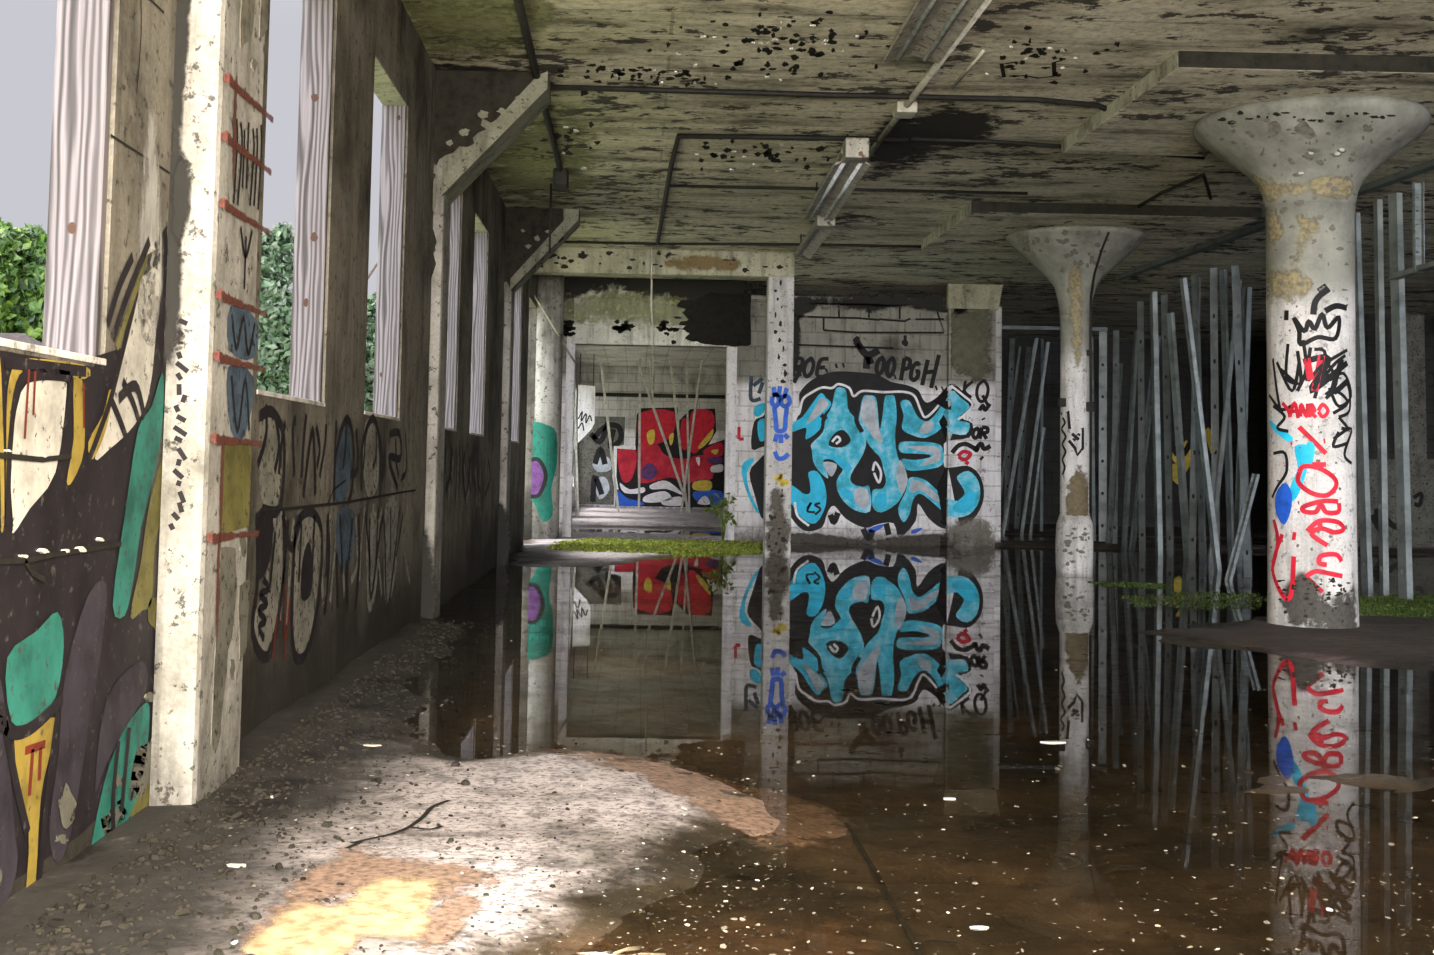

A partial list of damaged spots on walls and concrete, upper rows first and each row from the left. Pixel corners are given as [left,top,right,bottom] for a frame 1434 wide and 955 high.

peeling [580,10,869,96]
rust [219,72,273,236]
peeling [433,68,565,181]
leakage [869,102,1002,174]
peeling [1218,111,1400,266]
rust [213,349,265,373]
rust [215,288,266,318]
peeling [563,320,576,337]
peeling [612,319,635,334]
peeling [656,292,752,347]
peeling [724,257,787,383]
rust [206,432,262,647]